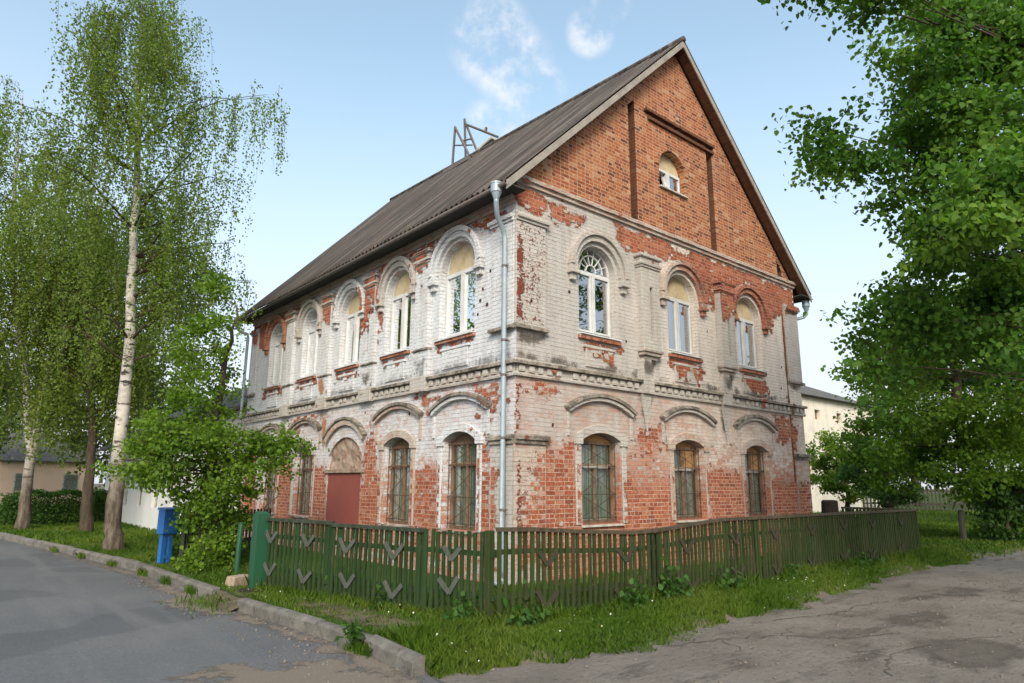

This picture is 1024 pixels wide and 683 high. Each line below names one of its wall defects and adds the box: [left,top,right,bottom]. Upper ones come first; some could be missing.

peeling [356,264,387,345]
peeling [515,178,588,326]
peeling [612,213,799,334]
peeling [414,387,447,416]
peeling [667,357,707,394]
peeling [309,455,327,538]
peeling [358,432,380,549]
peeling [408,458,443,561]
peeling [465,369,561,561]
peeling [515,439,582,573]
peeling [617,422,677,562]